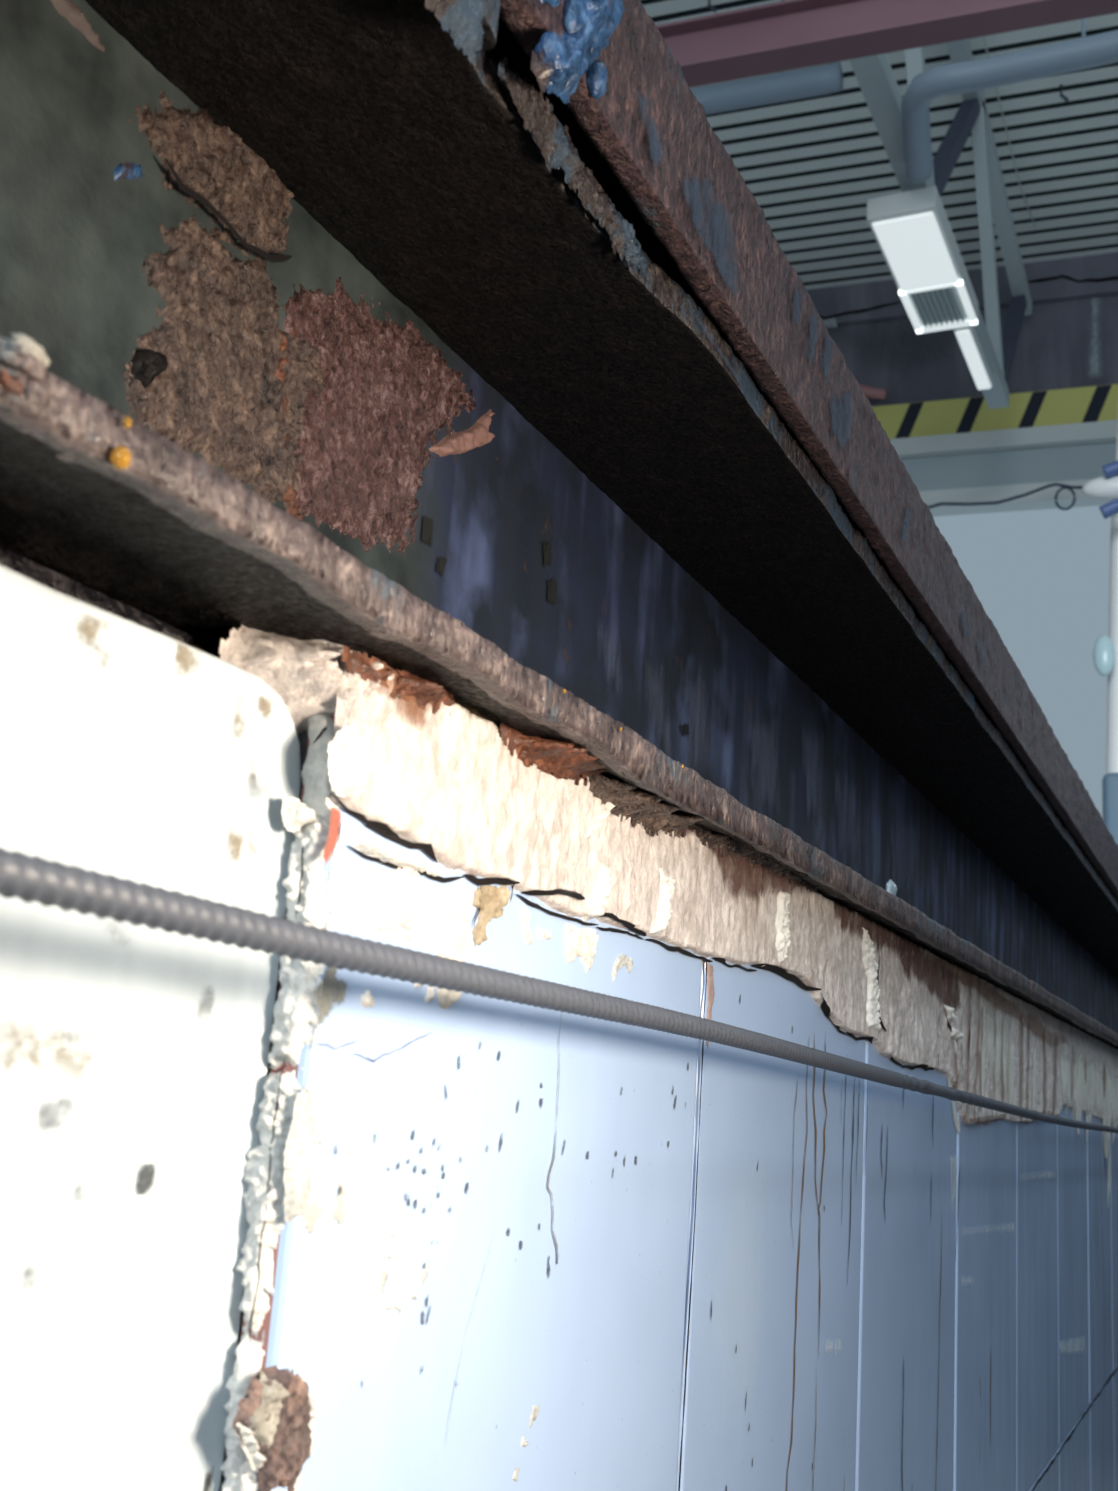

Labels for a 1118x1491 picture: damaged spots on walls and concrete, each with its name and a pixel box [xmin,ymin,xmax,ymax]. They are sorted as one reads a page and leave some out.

rust [123,90,477,555]
peeling [422,516,447,576]
peeling [369,867,421,942]
peeling [436,878,599,973]
peeling [361,990,375,1008]
peeling [414,983,462,1009]
peeling [612,954,634,983]
rust [827,898,1064,1124]
leakage [932,1076,960,1134]
peeling [283,1086,348,1234]
spalling [388,1131,461,1213]
leakage [786,1031,888,1491]